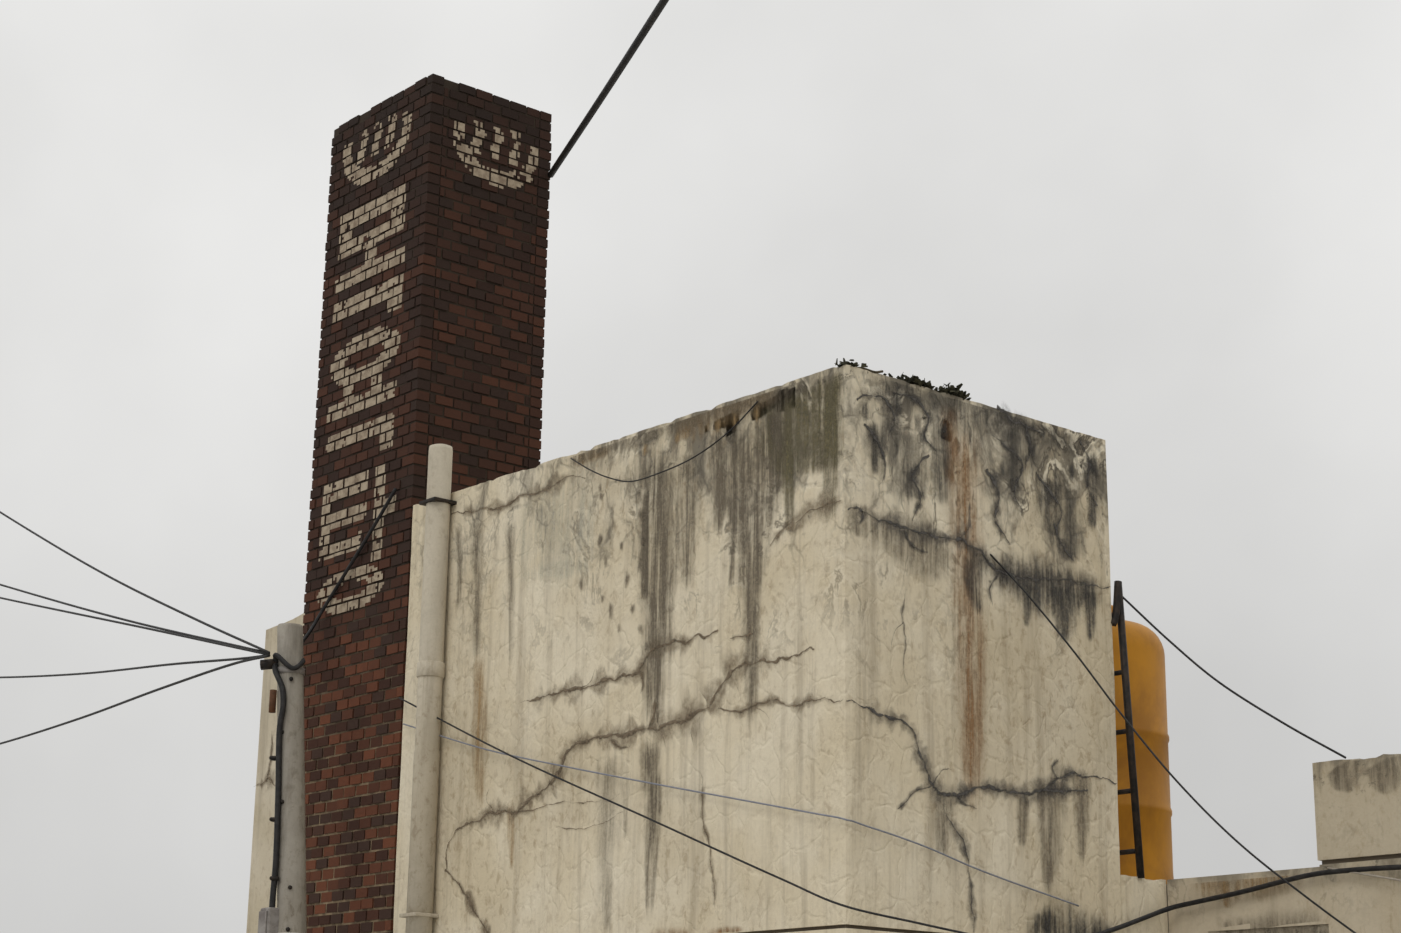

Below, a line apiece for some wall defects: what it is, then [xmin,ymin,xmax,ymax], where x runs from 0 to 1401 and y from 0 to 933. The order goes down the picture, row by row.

crack [452,475,584,514]
leakage [582,376,840,710]
crack [770,393,1110,601]
leakage [965,554,982,610]
leakage [999,458,1097,638]
leakage [644,746,661,900]
crack [445,629,1117,933]
leakage [1020,792,1056,883]